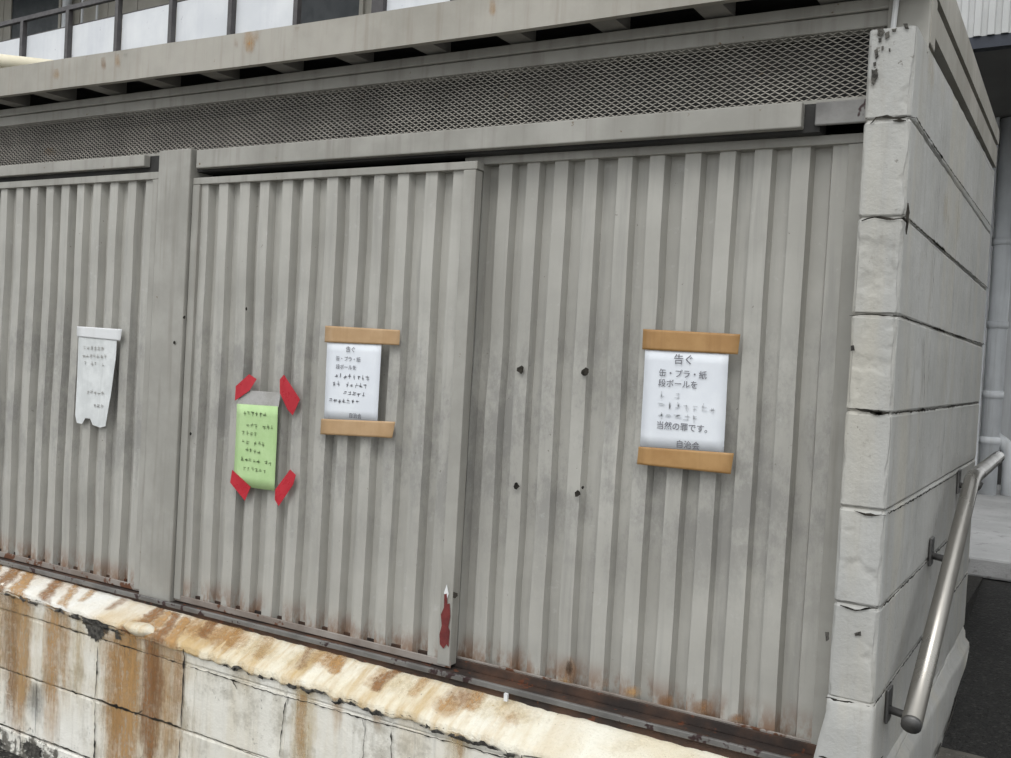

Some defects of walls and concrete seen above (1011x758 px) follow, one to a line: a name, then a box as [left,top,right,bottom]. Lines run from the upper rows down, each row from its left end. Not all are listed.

peeling [871,23,909,86]
crack [870,115,992,227]
crack [861,203,987,292]
rust [0,565,35,714]
rust [40,579,93,702]
rust [107,607,240,758]
rust [372,670,401,691]